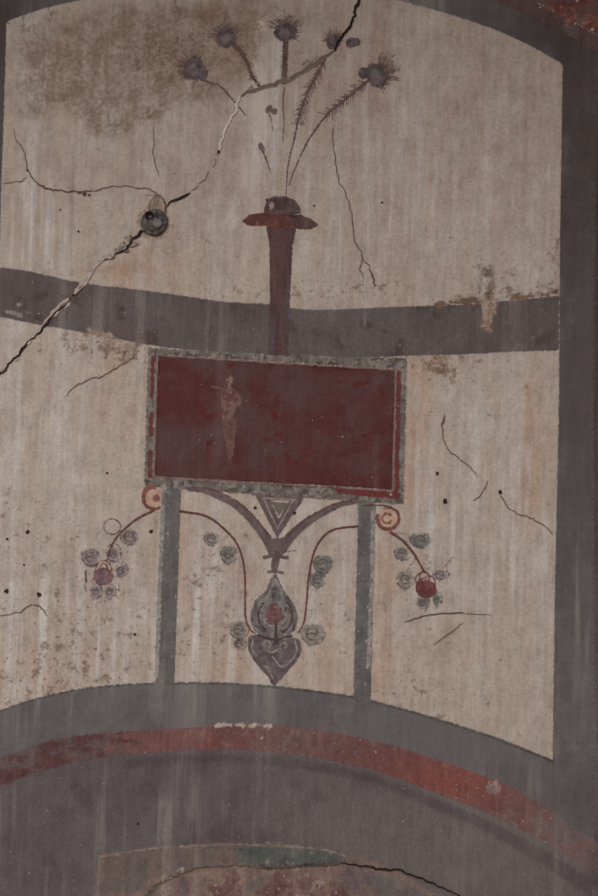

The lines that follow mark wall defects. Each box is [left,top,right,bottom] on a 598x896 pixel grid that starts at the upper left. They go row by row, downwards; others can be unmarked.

crack [0,0,360,374]
crack [332,131,375,285]
peeling [434,289,496,332]
crack [67,356,134,395]
crack [440,414,552,534]
crack [0,604,47,616]
crack [144,862,460,896]